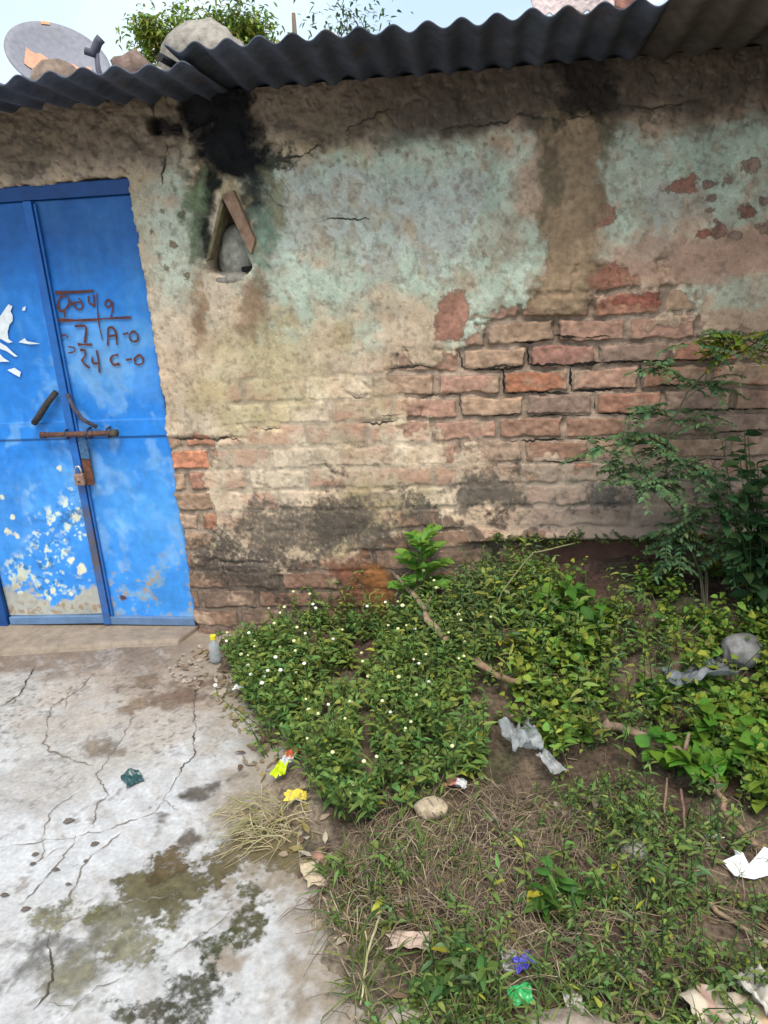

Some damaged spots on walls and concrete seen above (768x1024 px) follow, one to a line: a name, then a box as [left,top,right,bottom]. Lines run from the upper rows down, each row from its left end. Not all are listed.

crack [441,90,586,131]
crack [611,99,702,110]
water stain [191,171,222,258]
crack [316,216,368,224]
water stain [526,59,619,319]
peeling [663,156,768,241]
flaking render [383,258,768,484]
water stain [188,457,533,609]
water stain [179,782,219,801]
crack [0,668,197,1020]
water stain [178,829,199,849]
water stain [16,898,138,997]